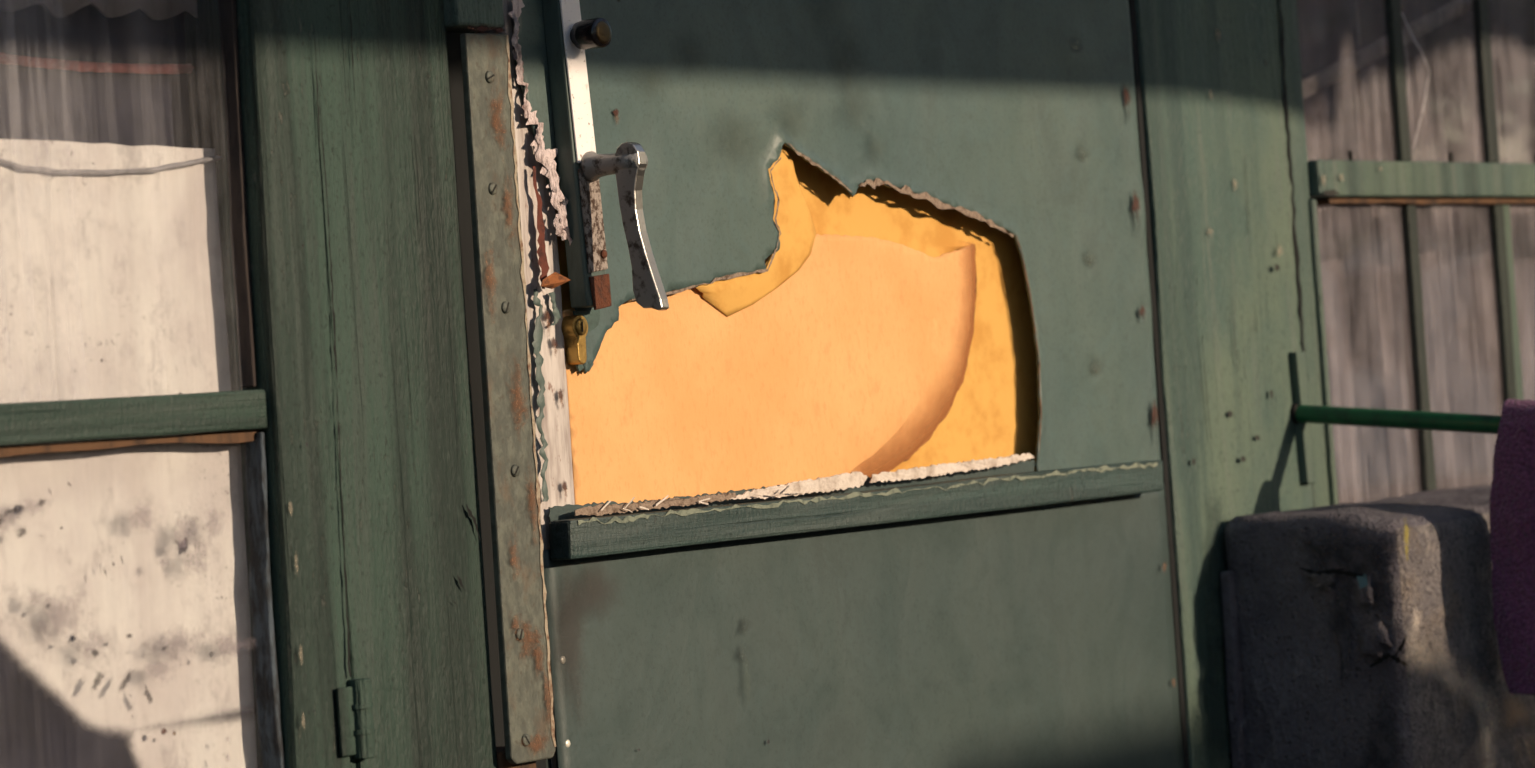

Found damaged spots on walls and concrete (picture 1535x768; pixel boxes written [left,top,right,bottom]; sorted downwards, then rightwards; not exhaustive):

peeling [508,0,573,245]
crack [1278,0,1308,380]